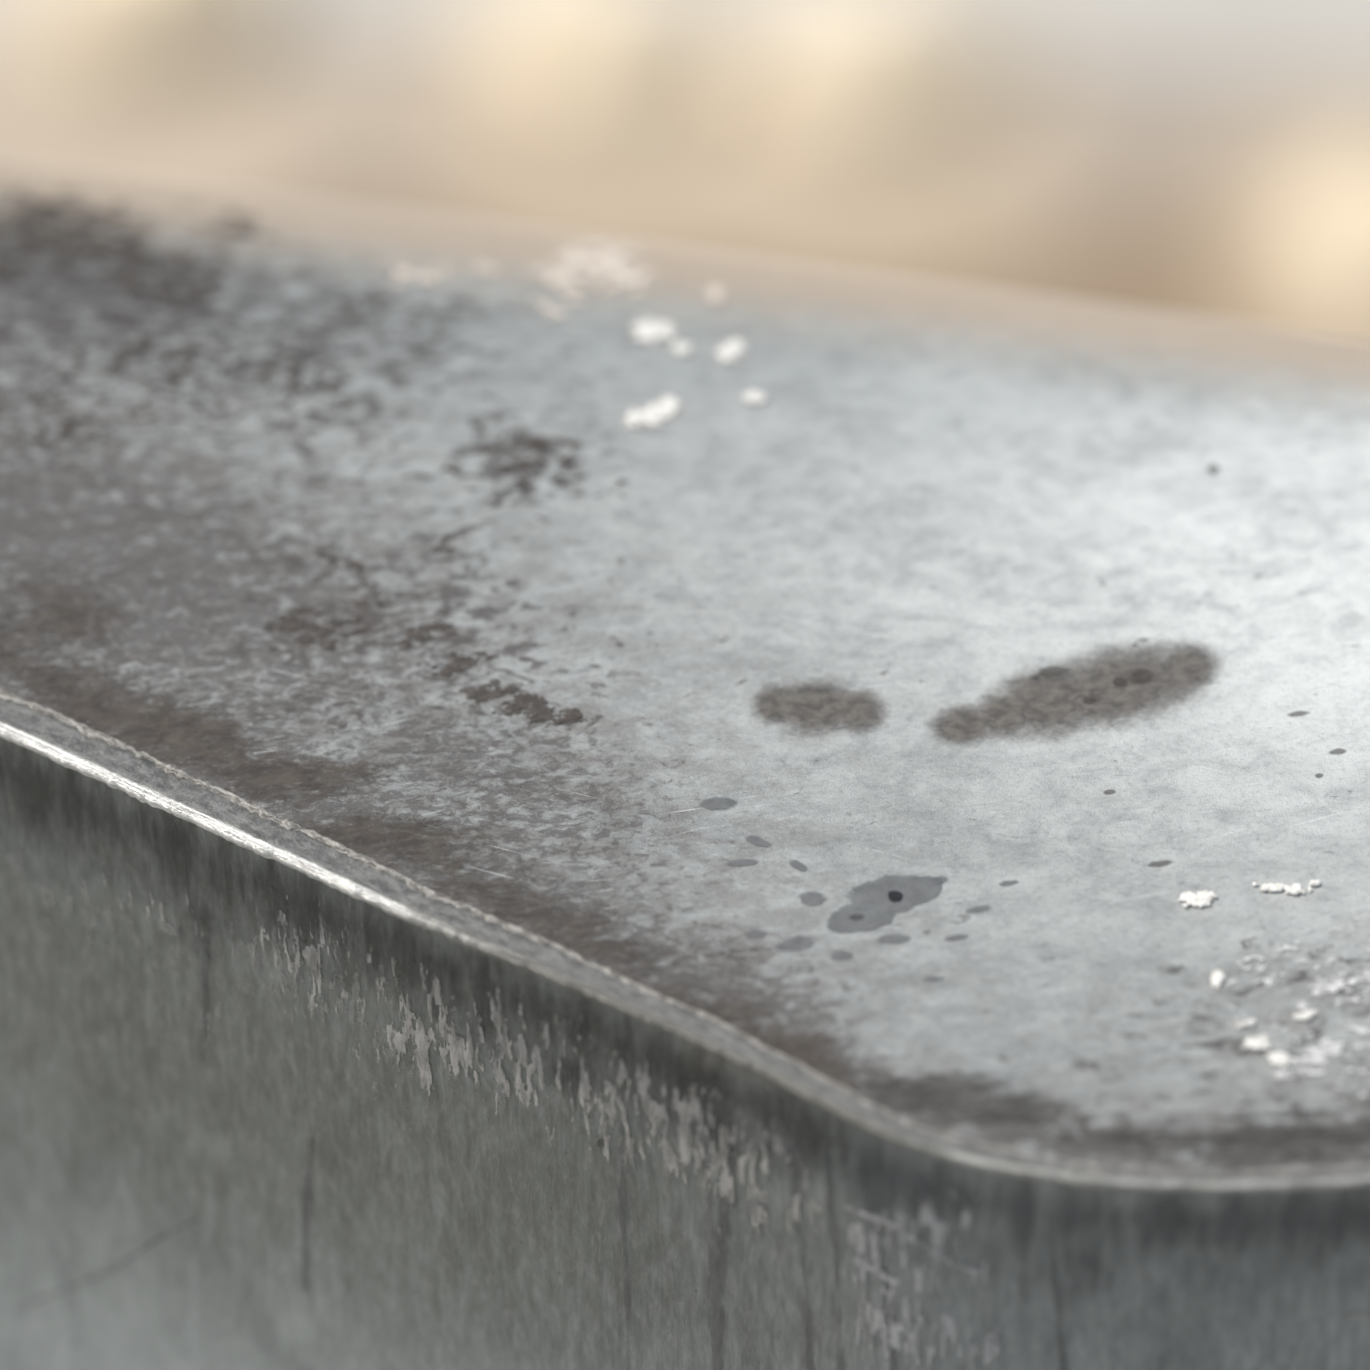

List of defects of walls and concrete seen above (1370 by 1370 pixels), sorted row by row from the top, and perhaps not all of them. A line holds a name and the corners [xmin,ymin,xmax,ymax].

damp [757,683,882,730]
damp [935,646,1214,741]
damp [700,797,736,810]
damp [727,835,771,866]
damp [790,860,806,871]
damp [800,875,947,944]
peeling [1178,890,1218,908]
peeling [1252,880,1321,895]
damp [746,930,812,951]
peeling [1198,915,1370,1098]
peeling [252,896,822,1248]
peeling [848,1190,1013,1369]